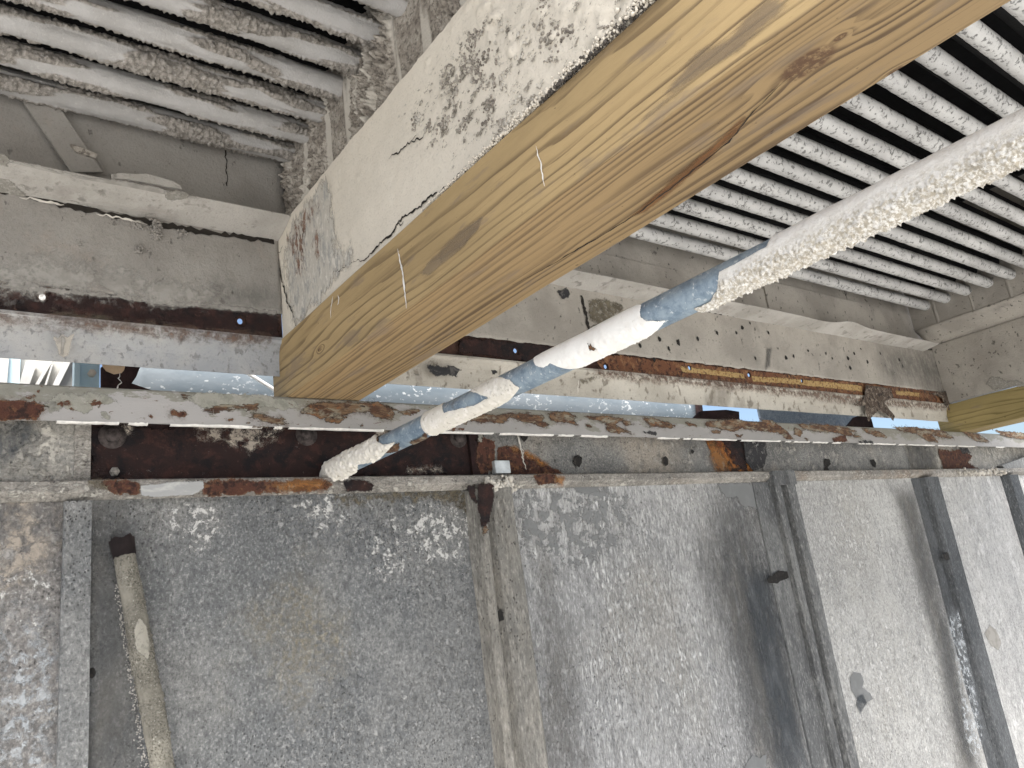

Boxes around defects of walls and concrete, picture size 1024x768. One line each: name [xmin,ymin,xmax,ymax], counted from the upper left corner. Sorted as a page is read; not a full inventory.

peeling [287,207,319,274]
crack [335,171,461,272]
rust [0,287,280,343]
rust [0,390,49,421]
rust [88,409,565,535]
rust [458,337,553,362]
rust [584,414,657,436]
rust [706,440,753,472]
rust [588,344,950,411]
rust [938,429,1024,469]